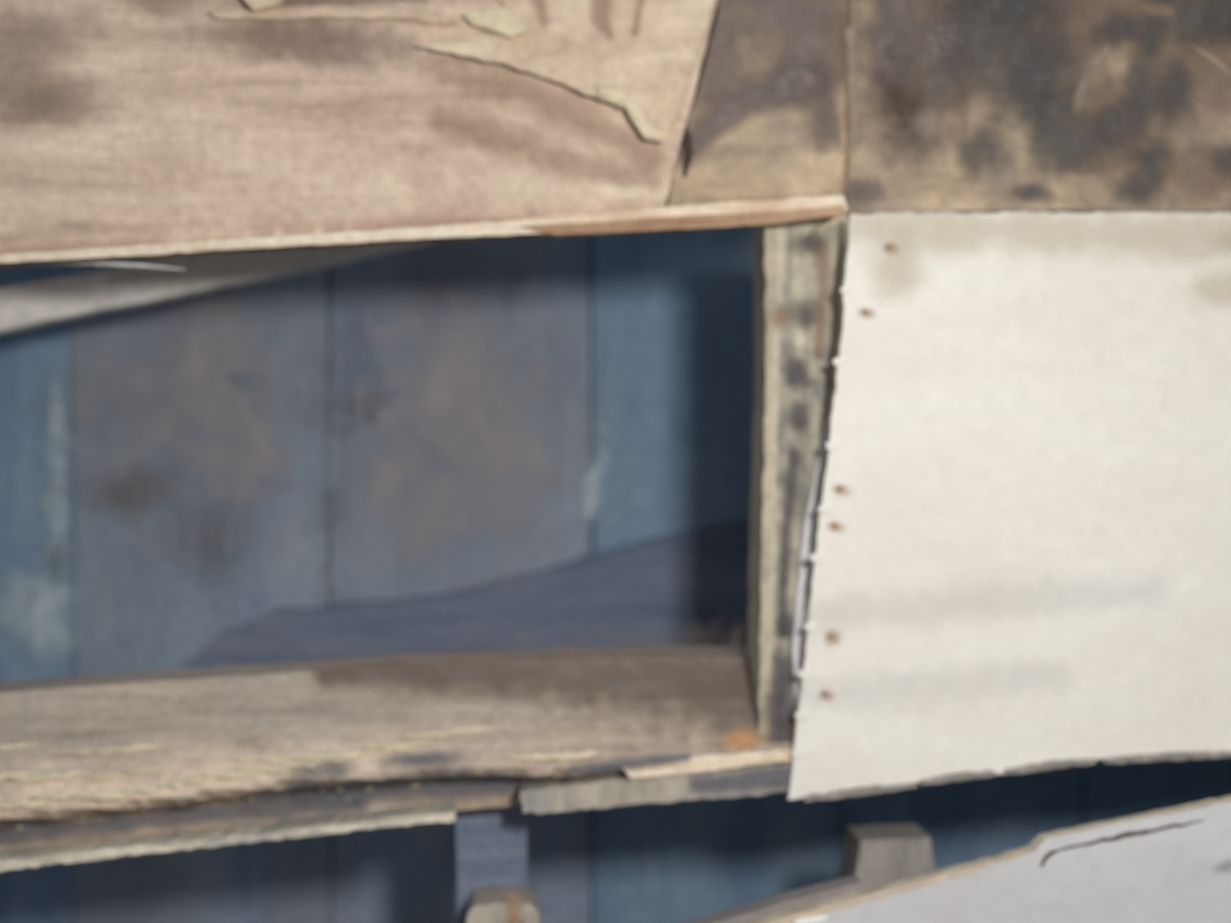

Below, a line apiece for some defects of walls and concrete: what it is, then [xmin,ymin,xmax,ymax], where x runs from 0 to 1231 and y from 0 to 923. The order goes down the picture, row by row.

peeling [462,7,527,38]
peeling [597,85,669,142]
damp [679,0,1231,204]
damp [796,305,814,326]
damp [788,366,805,385]
damp [792,405,807,428]
damp [779,448,800,635]
crack [1040,820,1204,867]
peeling [767,848,1042,923]